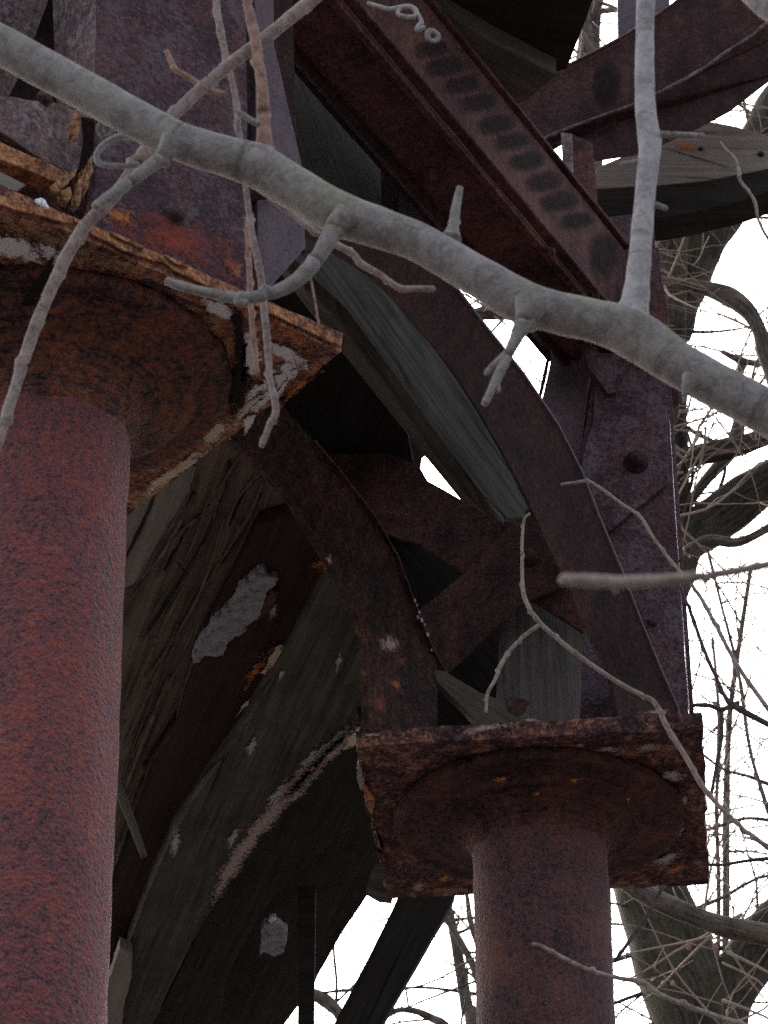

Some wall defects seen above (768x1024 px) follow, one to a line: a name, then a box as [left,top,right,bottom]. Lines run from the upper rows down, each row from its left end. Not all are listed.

corrosion [109,210,208,259]
spalling [192,564,279,663]
peeling [260,645,282,675]
corrosion [382,635,404,663]
spalling [260,913,288,957]